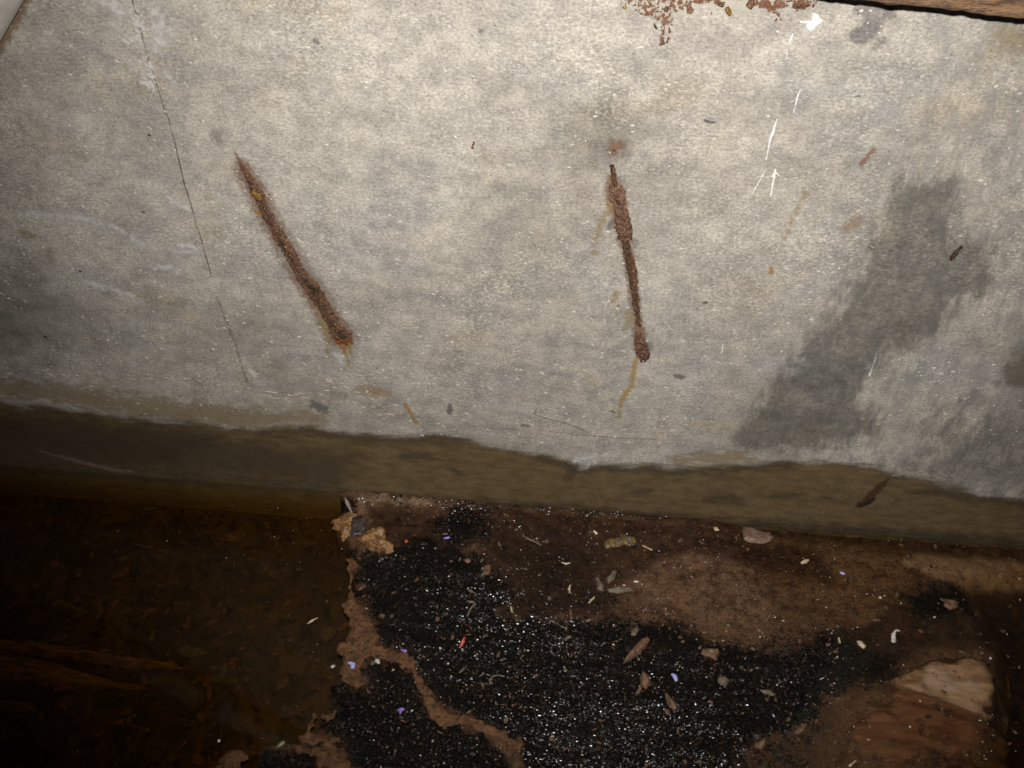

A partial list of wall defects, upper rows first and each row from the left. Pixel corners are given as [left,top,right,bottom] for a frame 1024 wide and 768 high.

crack [132,0,214,276]
corrosion [621,0,818,46]
leakage [0,177,1024,549]